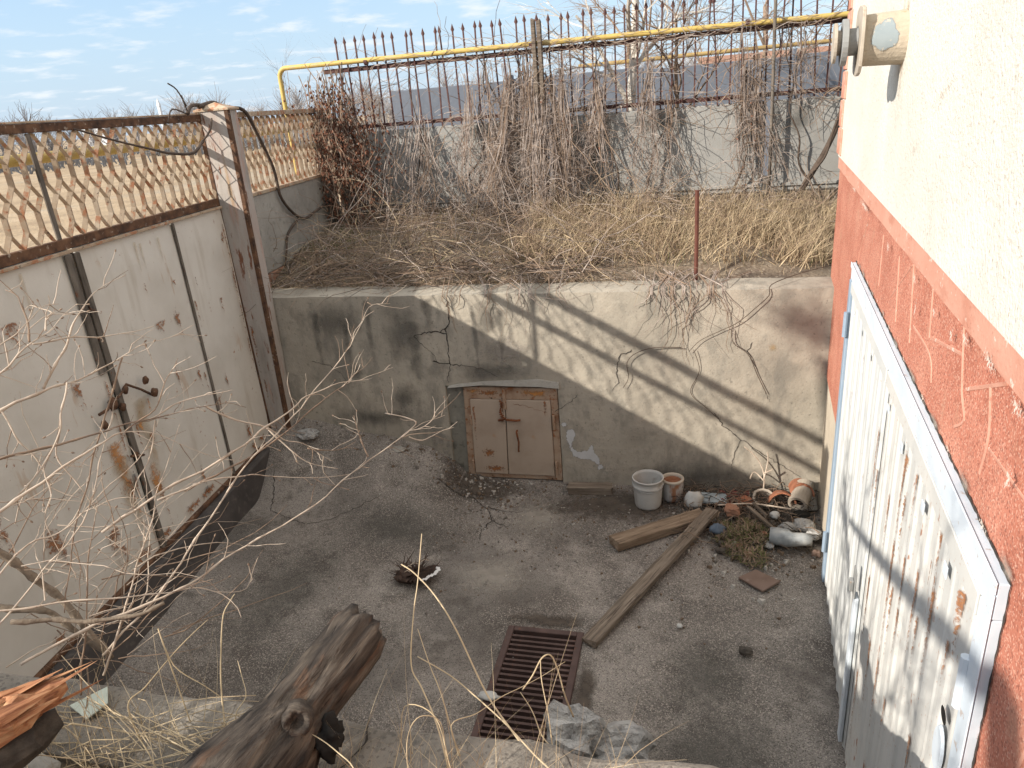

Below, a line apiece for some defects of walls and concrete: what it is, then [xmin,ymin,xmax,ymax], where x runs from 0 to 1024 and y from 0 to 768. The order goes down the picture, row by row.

crack [414,304,497,381]
corrosion [110,413,146,510]
corrosion [152,466,173,537]
peeling [561,422,603,470]
corrosion [883,455,942,650]
corrosion [941,591,966,673]